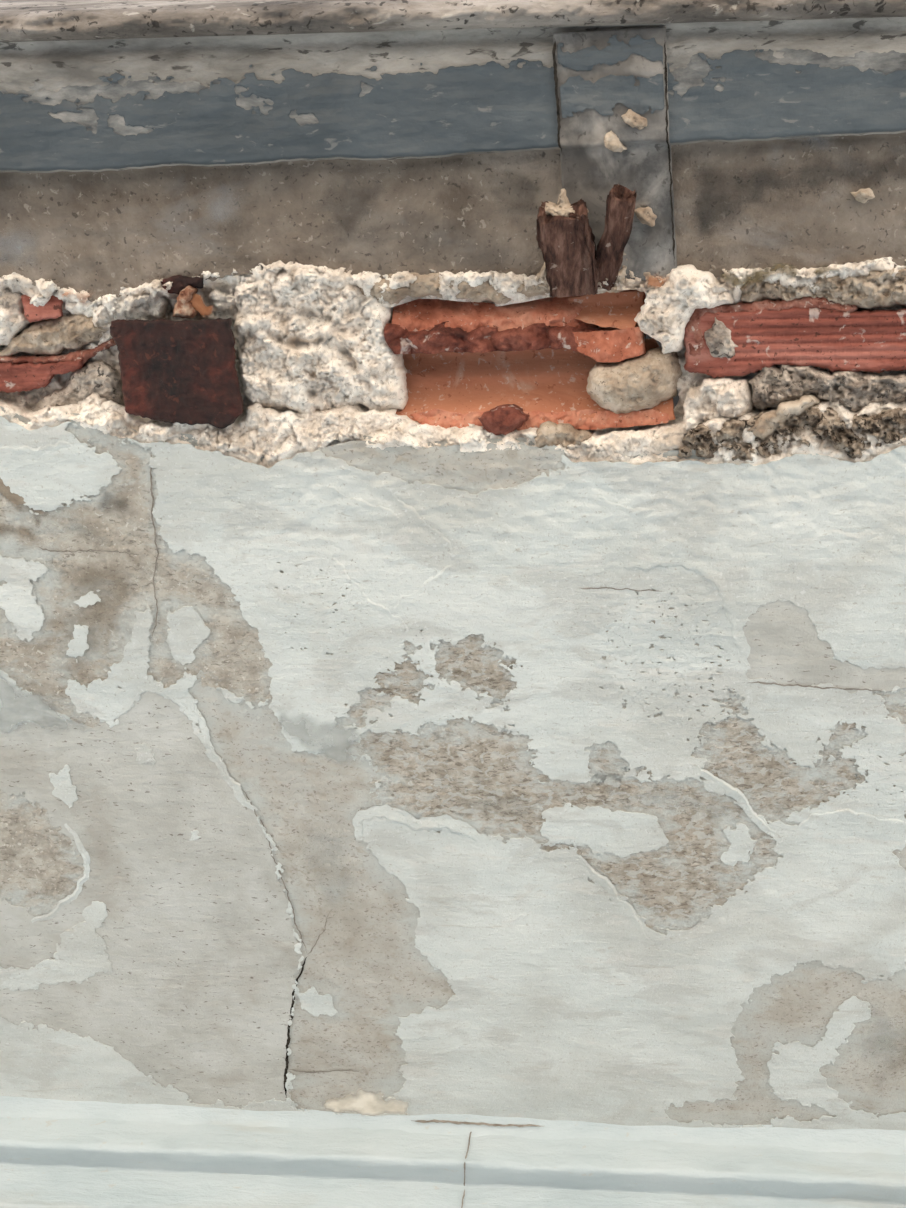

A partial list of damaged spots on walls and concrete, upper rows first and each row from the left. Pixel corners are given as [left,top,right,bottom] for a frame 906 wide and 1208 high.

peeling [0,76,221,136]
peeling [234,86,274,115]
peeling [289,109,319,126]
peeling [667,54,726,97]
peeling [752,48,906,75]
peeling [0,257,906,1125]
crack [244,791,359,1097]
crack [411,1119,541,1208]